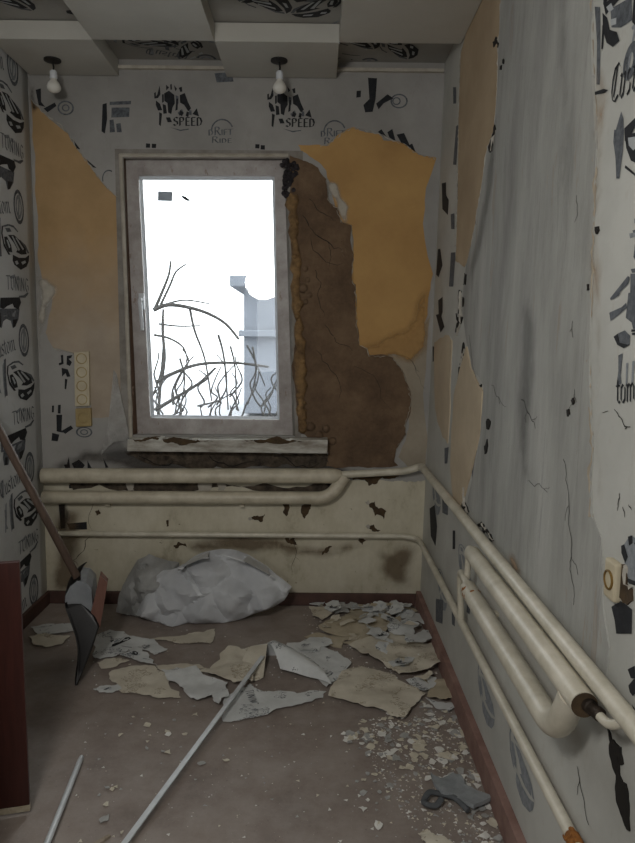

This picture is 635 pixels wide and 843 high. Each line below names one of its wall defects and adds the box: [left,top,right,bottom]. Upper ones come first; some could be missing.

flaking render [388,317,430,466]
flaking render [126,436,329,468]
flaking render [69,483,332,491]
spalling [352,475,400,486]
spalling [301,504,311,519]
spalling [365,500,386,532]
crack [528,459,578,605]
leakage [386,551,409,580]